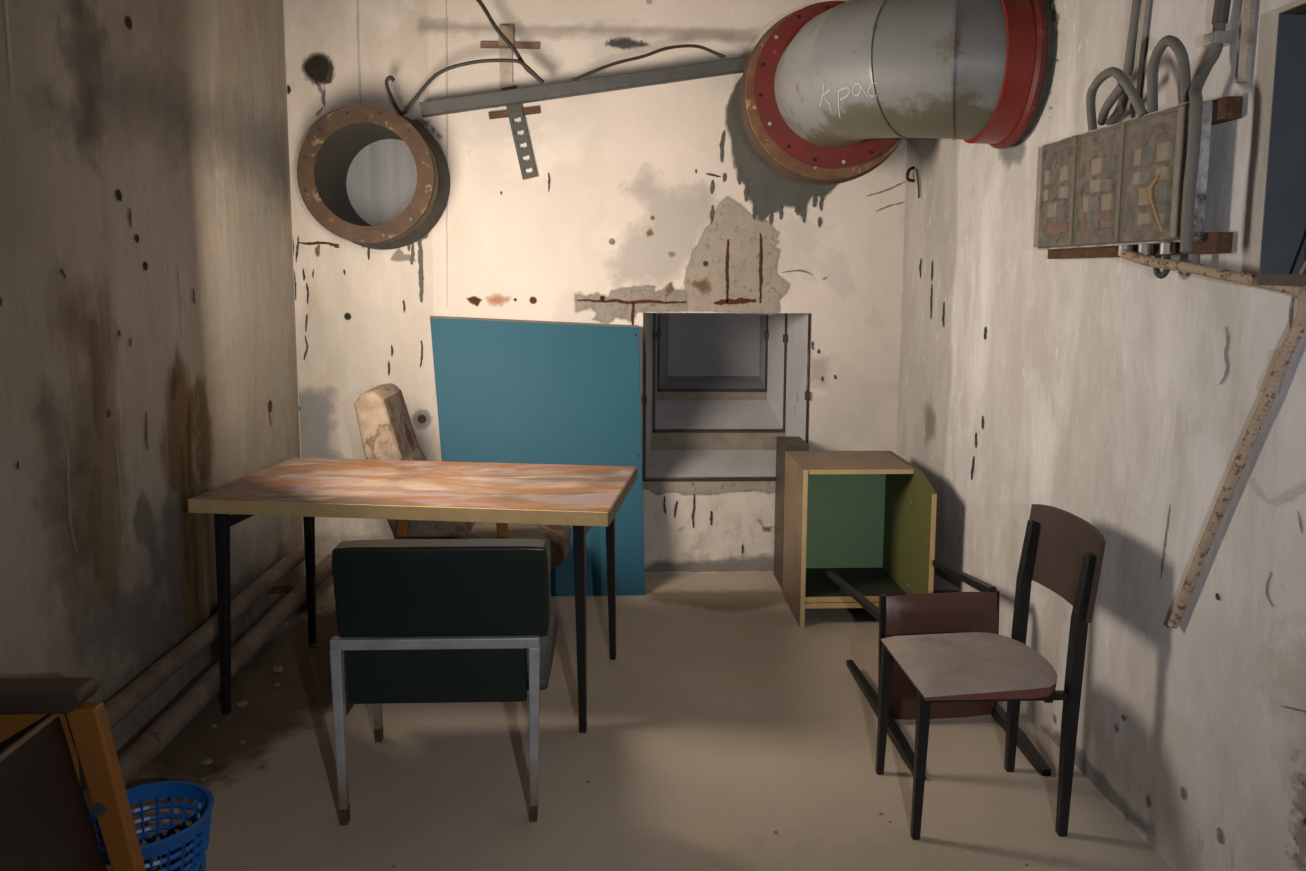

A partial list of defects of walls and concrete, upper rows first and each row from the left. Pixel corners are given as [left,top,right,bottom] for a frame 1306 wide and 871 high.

flaking render [575,197,789,325]
leakage [69,306,116,602]
flaking render [1287,756,1306,871]